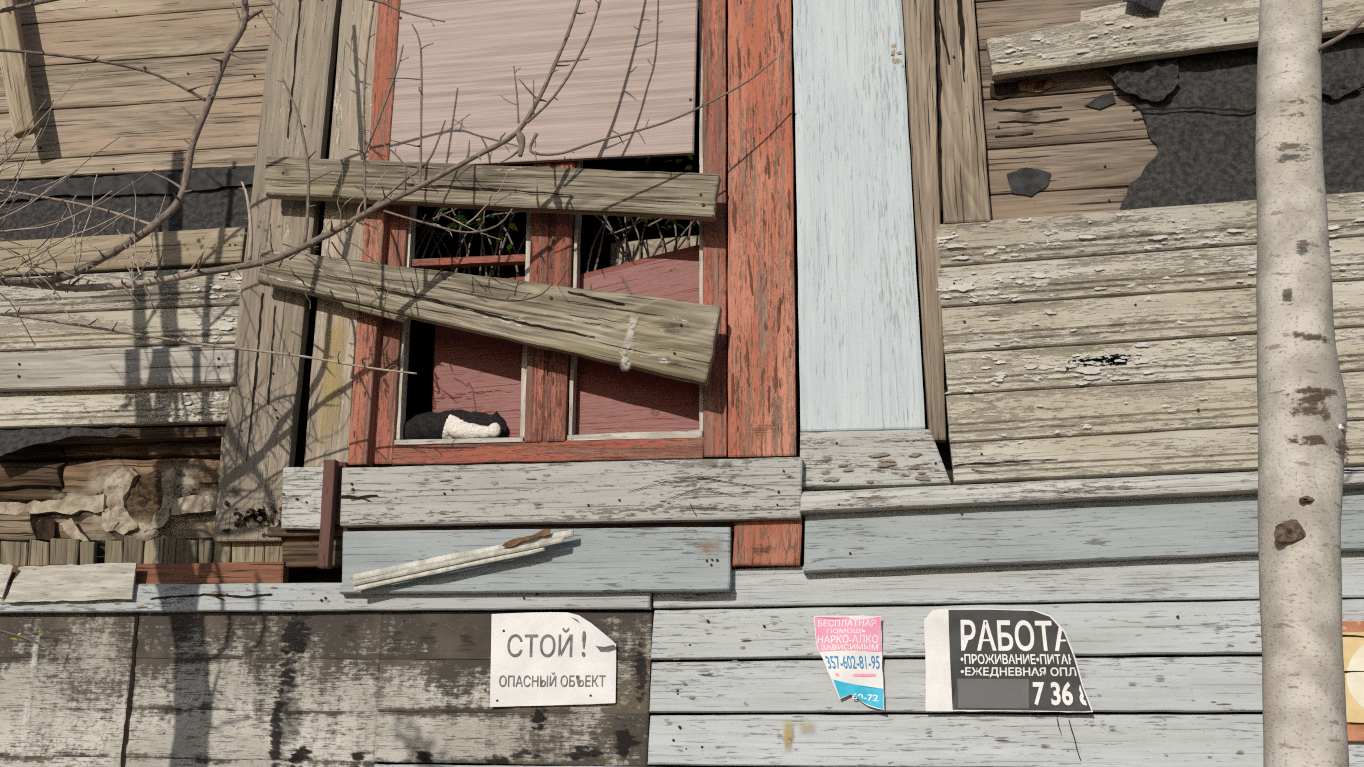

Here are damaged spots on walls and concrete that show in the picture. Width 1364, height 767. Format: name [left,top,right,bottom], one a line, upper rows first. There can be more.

peeling [996,19,1135,63]
peeling [935,217,1157,394]
peeling [1094,211,1257,311]
peeling [1328,199,1364,288]
flaking render [59,467,211,540]
leakage [268,612,312,767]
leakage [415,751,433,762]